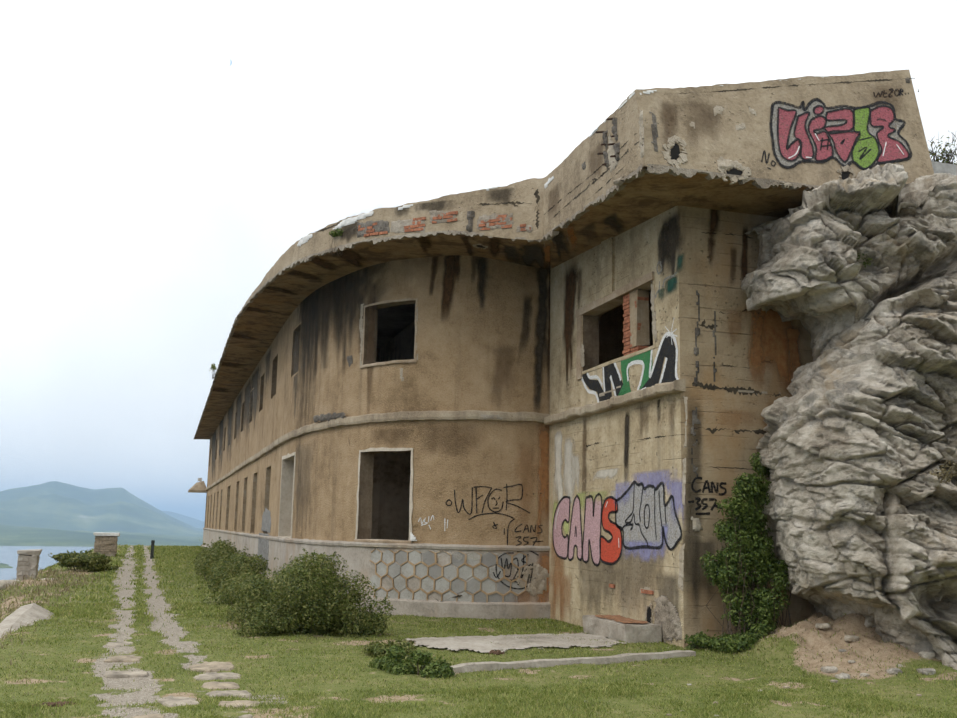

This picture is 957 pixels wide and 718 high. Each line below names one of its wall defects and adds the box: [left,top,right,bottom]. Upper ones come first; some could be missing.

leakage [430,255,460,316]
leakage [473,257,487,306]
spalling [194,92,819,439]
leakage [504,231,568,407]
leakage [564,266,581,381]
leakage [658,214,684,275]
rust [749,308,801,385]